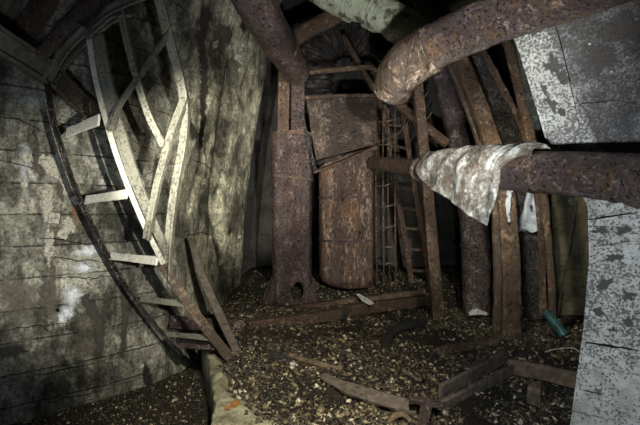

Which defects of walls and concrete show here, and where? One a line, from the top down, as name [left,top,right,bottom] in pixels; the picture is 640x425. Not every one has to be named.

leakage [197,29,209,151]
crack [556,26,638,127]
crack [40,232,113,288]
leakage [75,246,97,272]
crack [1,322,76,334]
leakage [0,266,105,359]
crack [585,342,639,351]